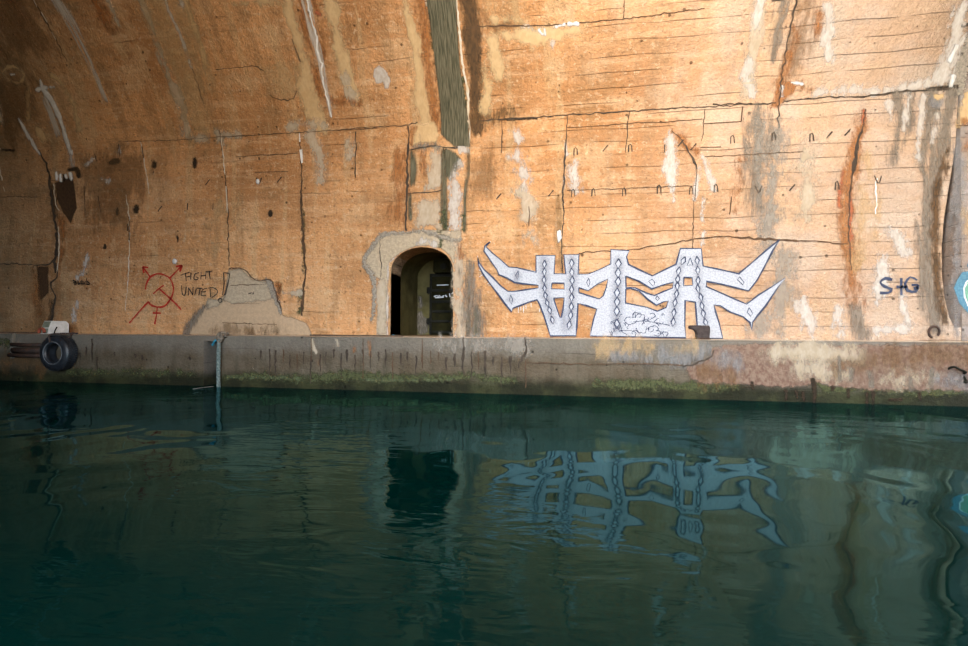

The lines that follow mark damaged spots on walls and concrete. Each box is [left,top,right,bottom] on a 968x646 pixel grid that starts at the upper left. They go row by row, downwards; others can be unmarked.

crack [0,148,65,321]
leakage [2,65,82,168]
spalling [183,267,311,335]
crack [119,120,442,316]
spalling [362,228,462,335]
leakage [403,0,484,337]
leakage [460,0,705,137]
leakage [662,131,716,202]
crack [481,0,958,273]
leakage [738,0,797,339]
leakage [814,2,835,63]
corrosion [837,109,870,340]